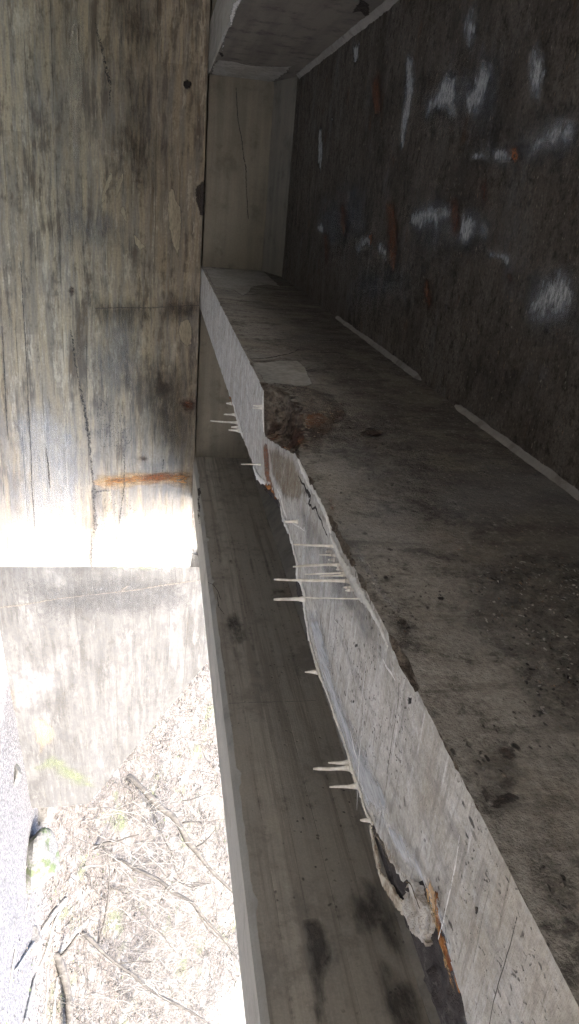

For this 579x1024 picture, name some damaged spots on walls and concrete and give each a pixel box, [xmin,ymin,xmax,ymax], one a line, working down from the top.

spalling [246,350,346,459]
crack [0,330,224,614]
rust [99,473,190,486]
rust [263,444,275,495]
crack [298,476,328,537]
leakage [305,921,328,991]
spalling [369,823,467,1024]